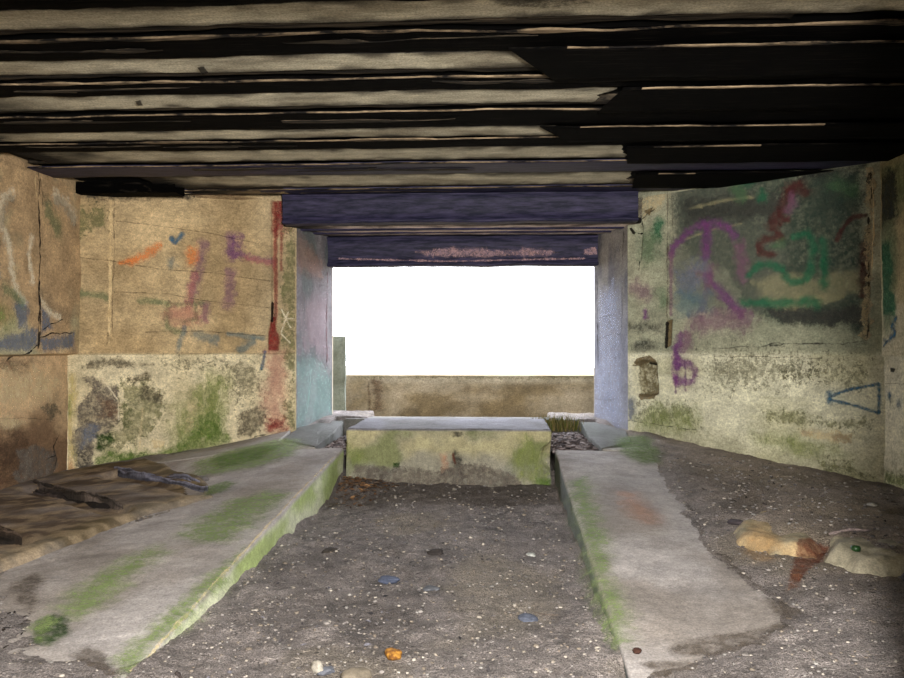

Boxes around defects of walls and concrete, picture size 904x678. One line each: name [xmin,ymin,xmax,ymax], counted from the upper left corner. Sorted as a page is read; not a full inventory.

crack [7,171,73,360]
leakage [82,353,266,450]